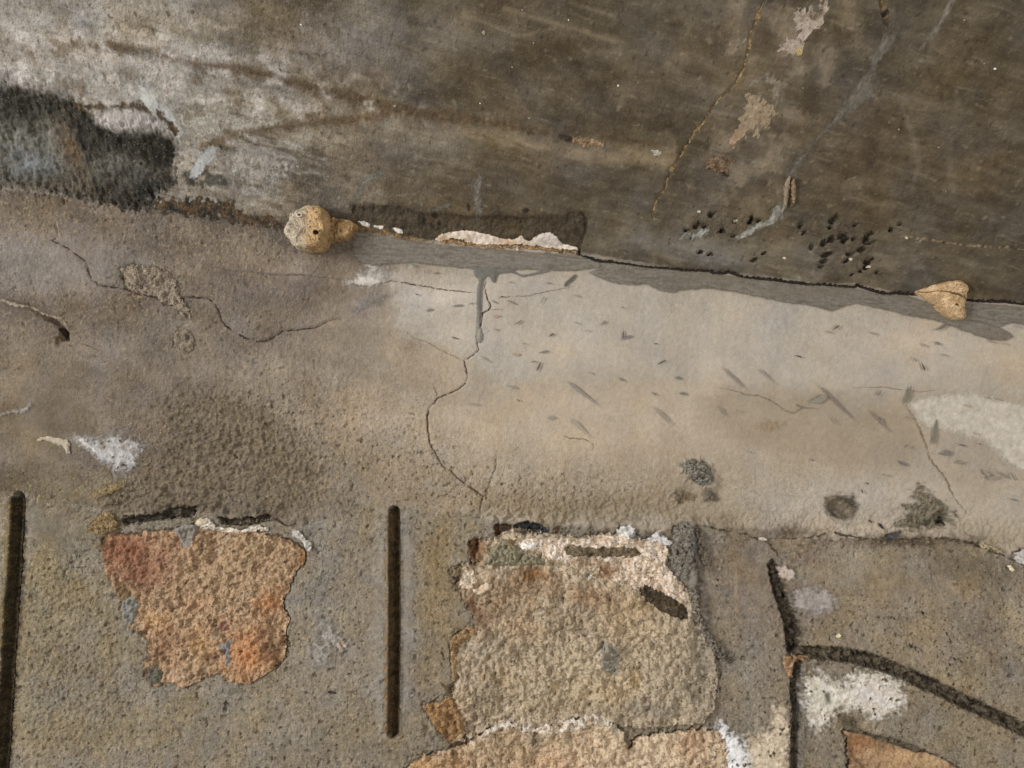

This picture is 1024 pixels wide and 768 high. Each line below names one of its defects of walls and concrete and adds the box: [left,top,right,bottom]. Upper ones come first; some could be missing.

water stain [0,40,299,231]
crack [0,298,97,350]
crack [51,224,335,342]
water stain [351,171,581,246]
peeling [435,230,578,255]
crack [578,214,1024,305]
crack [217,267,564,510]
spalling [99,524,305,689]
spalling [407,527,729,768]
water stain [480,711,621,739]
water stain [702,668,907,768]
spalling [842,716,957,768]